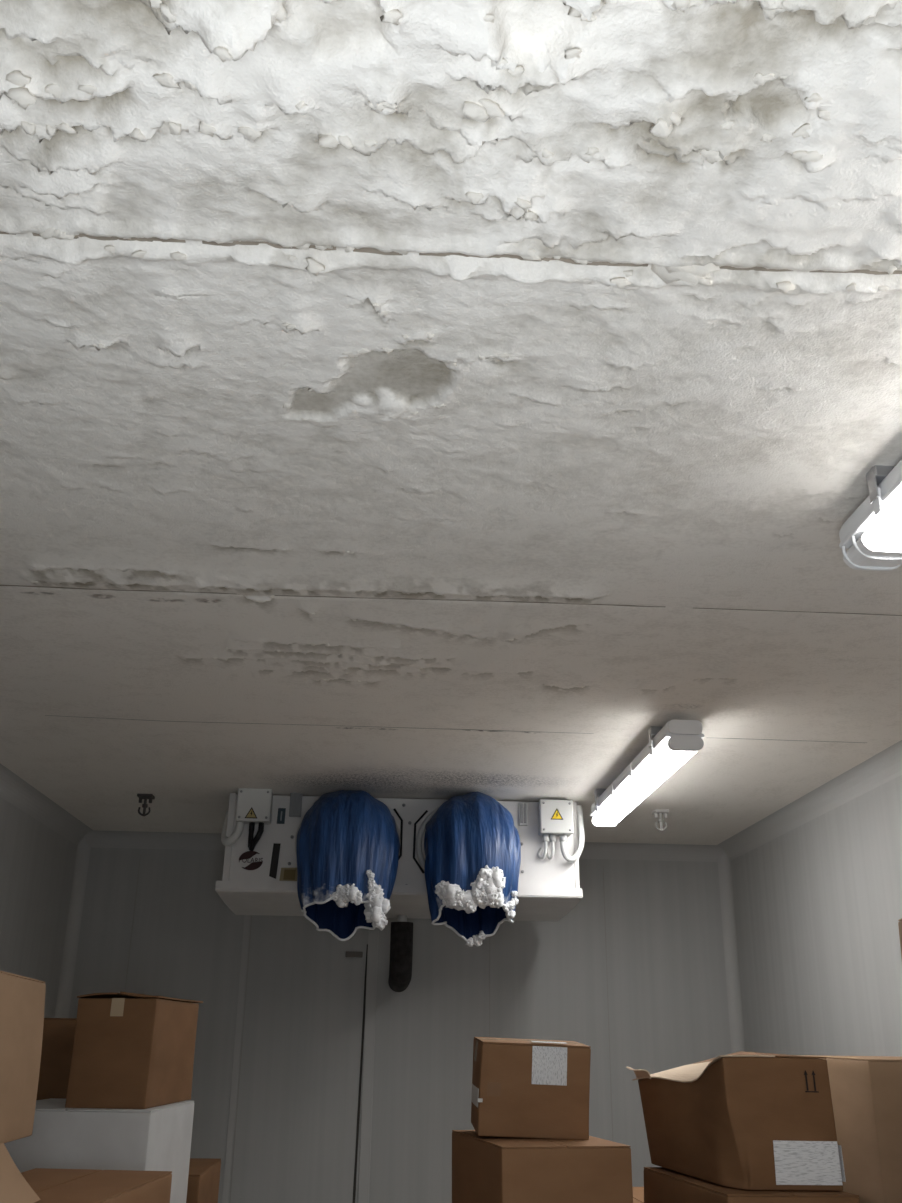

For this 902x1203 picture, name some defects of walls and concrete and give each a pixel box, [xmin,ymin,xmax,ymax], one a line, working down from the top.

peeling [150,0,176,23]
spalling [270,0,403,69]
spalling [478,0,606,83]
peeling [6,70,78,136]
peeling [153,73,197,90]
peeling [318,133,378,149]
peeling [463,98,505,121]
peeling [649,112,682,138]
spalling [717,73,831,163]
crack [0,215,902,295]
spalling [280,333,462,423]